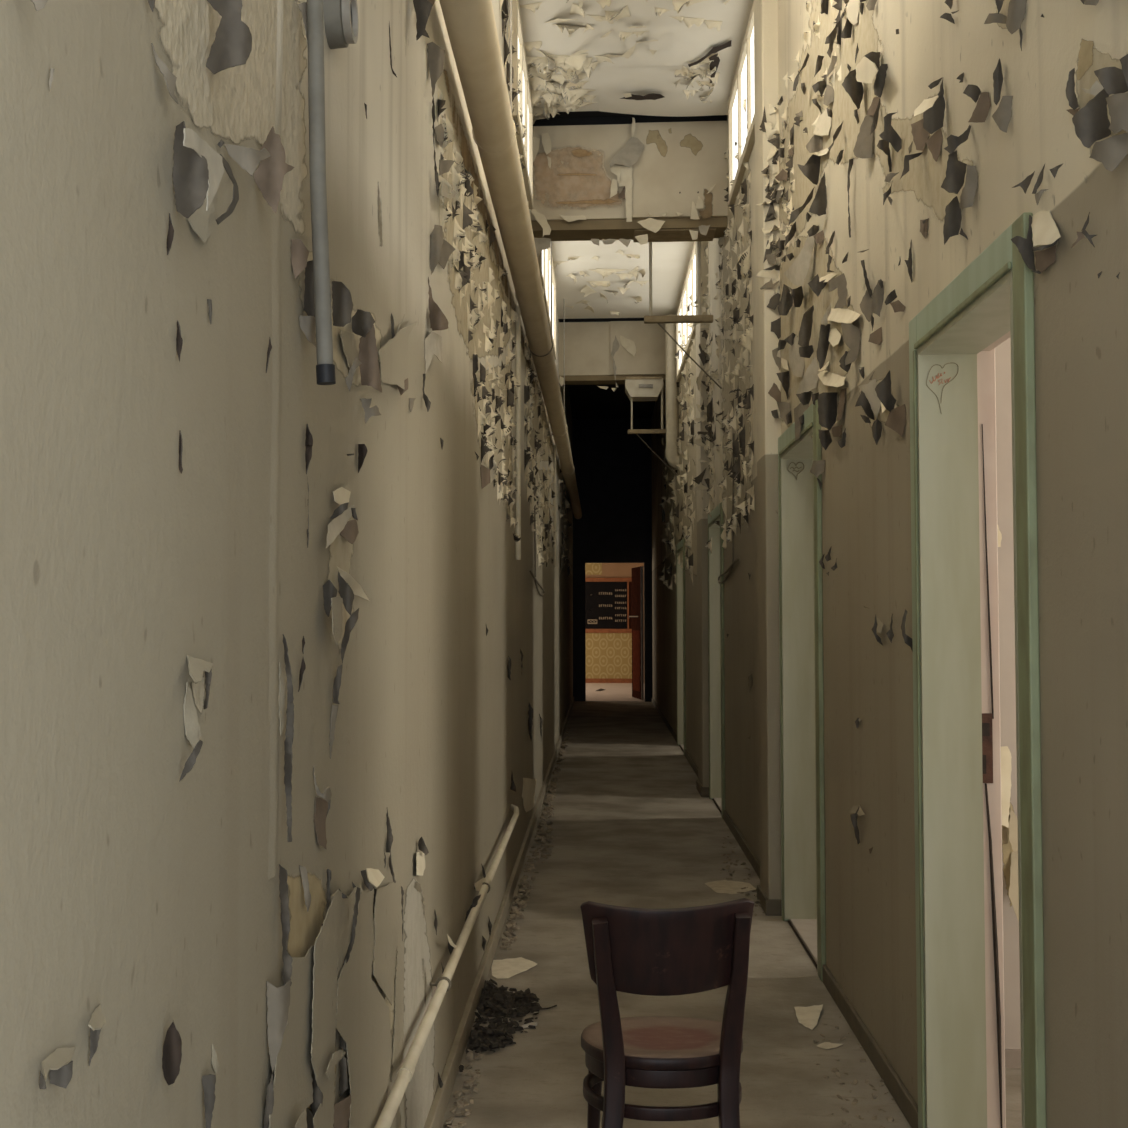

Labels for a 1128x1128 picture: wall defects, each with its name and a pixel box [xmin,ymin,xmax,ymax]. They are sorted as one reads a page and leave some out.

peeling [148,0,316,347]
peeling [330,0,573,577]
peeling [500,0,658,180]
peeling [527,0,1013,590]
peeling [984,0,1027,51]
peeling [1011,164,1096,274]
peeling [1066,48,1128,172]
peeling [323,487,370,759]
peeling [179,655,213,782]
peeling [313,767,332,849]
peeling [39,1005,105,1089]
peeling [263,809,457,1128]